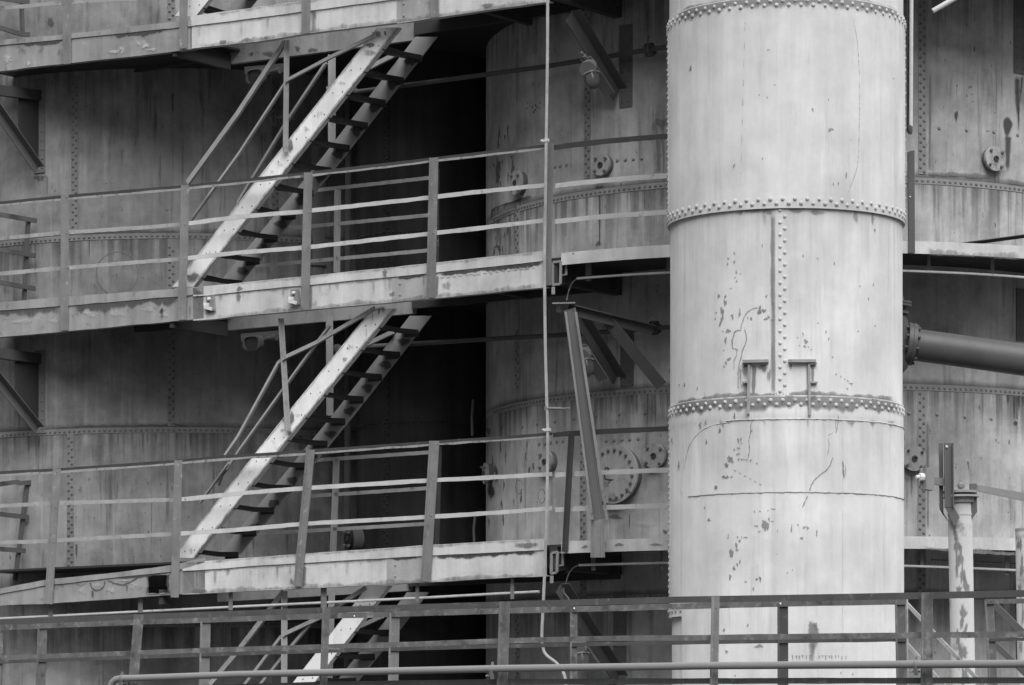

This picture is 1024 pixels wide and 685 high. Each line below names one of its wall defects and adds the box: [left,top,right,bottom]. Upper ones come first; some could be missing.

corrosion [1004,78,1023,167]
peeling [715,294,773,367]
peeling [714,438,757,489]
crack [802,415,839,507]
peeling [728,508,778,580]